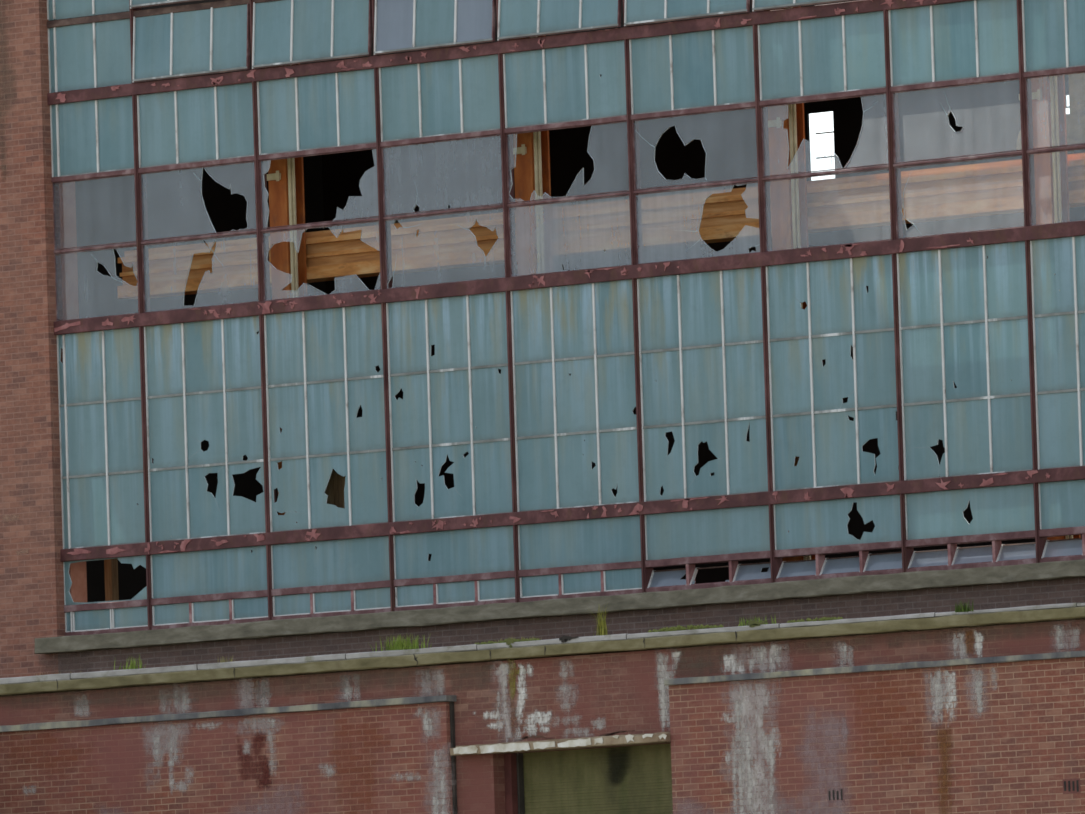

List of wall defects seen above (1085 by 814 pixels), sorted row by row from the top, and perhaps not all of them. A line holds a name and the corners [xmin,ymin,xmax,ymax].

peeling [801,244,867,257]
damp [954,633,983,659]
damp [146,724,191,790]
damp [478,664,552,741]
damp [658,650,709,728]
damp [724,644,787,814]
damp [925,669,996,722]